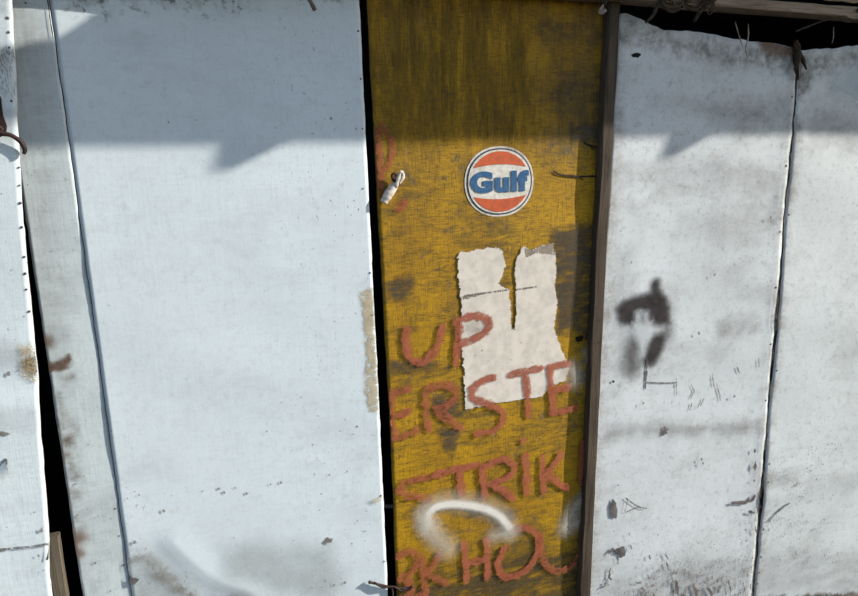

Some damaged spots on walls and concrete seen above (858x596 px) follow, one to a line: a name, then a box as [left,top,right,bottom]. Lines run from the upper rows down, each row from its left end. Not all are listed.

rust [20,345,38,381]
rust [48,354,71,372]